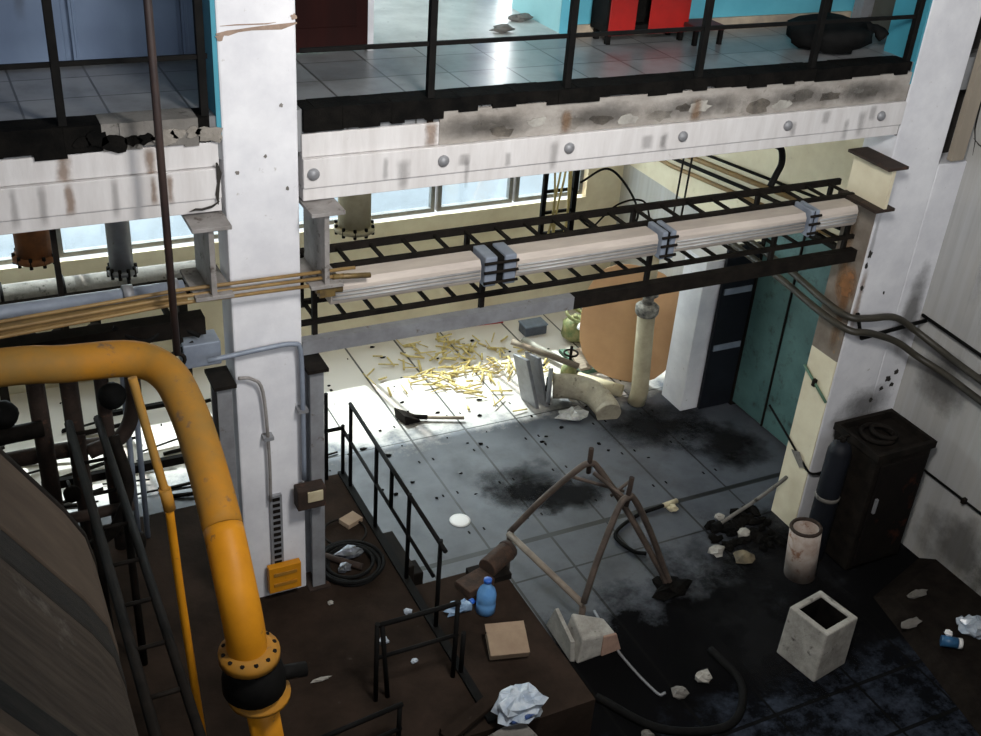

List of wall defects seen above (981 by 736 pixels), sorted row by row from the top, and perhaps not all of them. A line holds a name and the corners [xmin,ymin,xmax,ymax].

spalling [72,126,223,154]
crack [973,102,981,152]
crack [190,163,222,212]